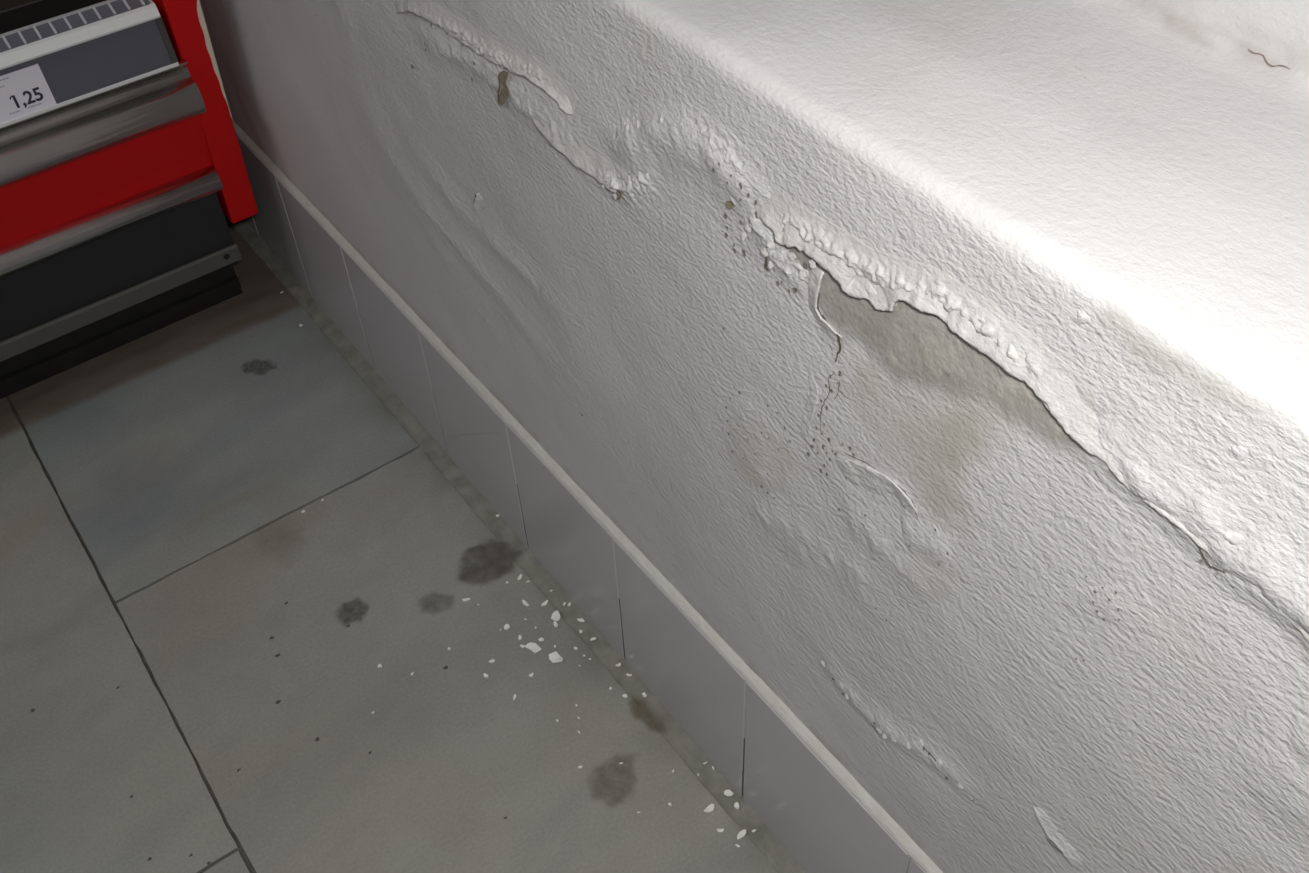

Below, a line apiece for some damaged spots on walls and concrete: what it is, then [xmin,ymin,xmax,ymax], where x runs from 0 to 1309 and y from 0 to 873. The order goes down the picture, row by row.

crack [1248,48,1290,69]
crack [801,294,854,476]
flaking render [724,192,1130,490]